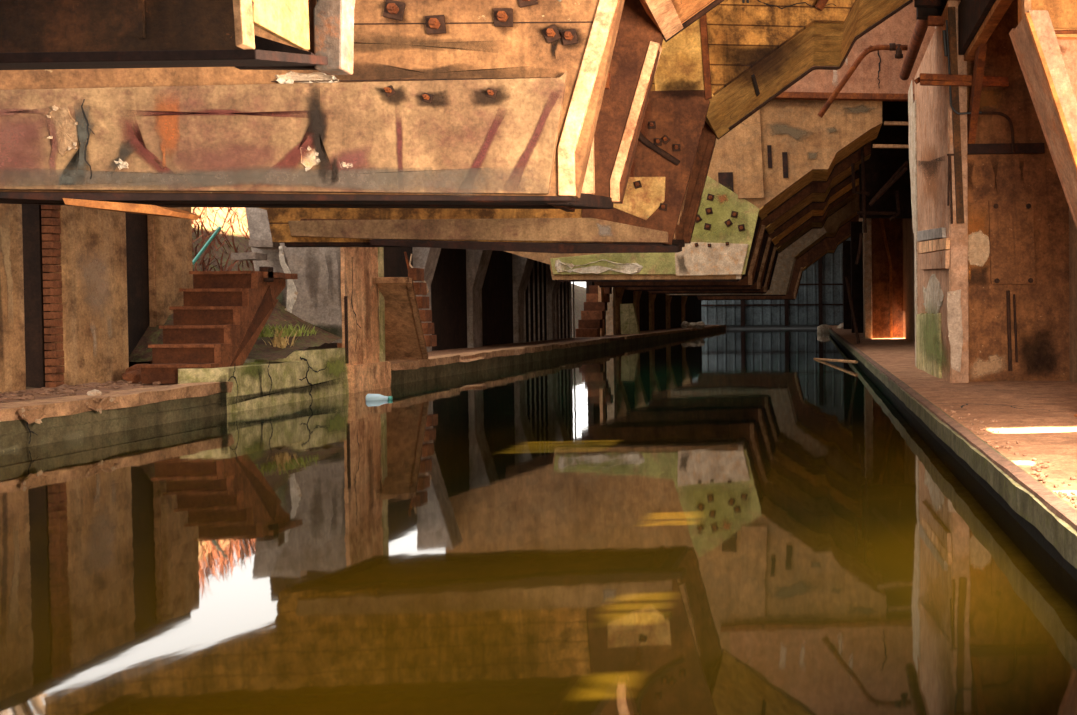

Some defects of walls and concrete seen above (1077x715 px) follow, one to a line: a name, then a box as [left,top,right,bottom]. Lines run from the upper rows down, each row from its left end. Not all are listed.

crack [757,0,836,9]
rust [475,89,506,105]
rust [470,119,501,172]
rust [509,101,555,180]
spalling [968,230,990,267]